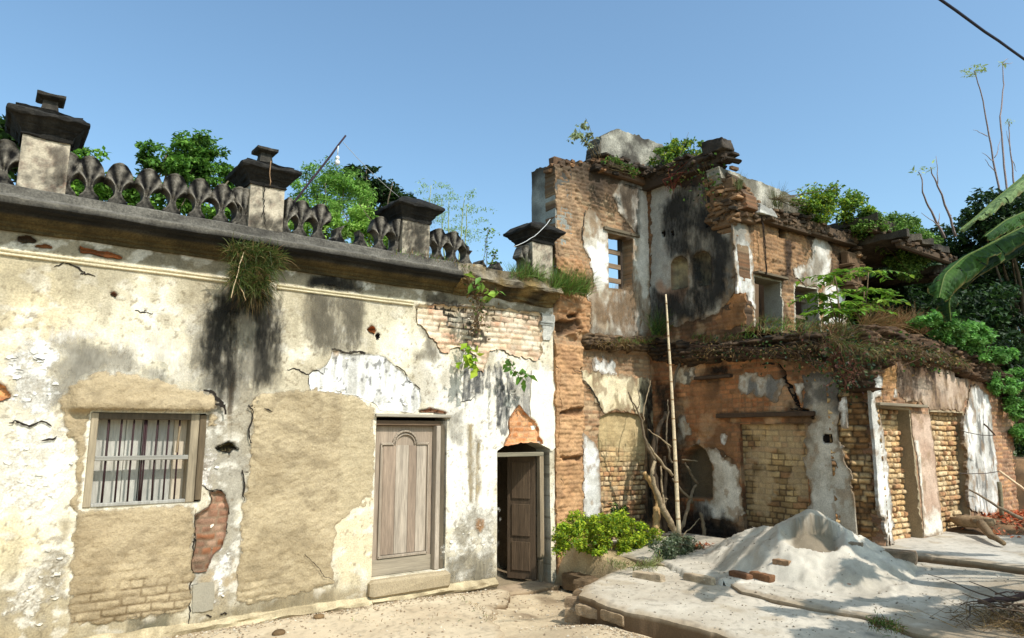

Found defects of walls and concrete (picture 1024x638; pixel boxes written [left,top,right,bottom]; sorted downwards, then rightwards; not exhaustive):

crack [54,262,95,276]
water stain [596,183,730,332]
water stain [196,287,280,395]
spalling [415,304,543,373]
crack [9,420,57,441]
crack [204,389,273,443]
peeling [309,351,447,414]
spalling [504,405,543,446]
crack [762,362,809,411]
spalling [191,442,239,603]